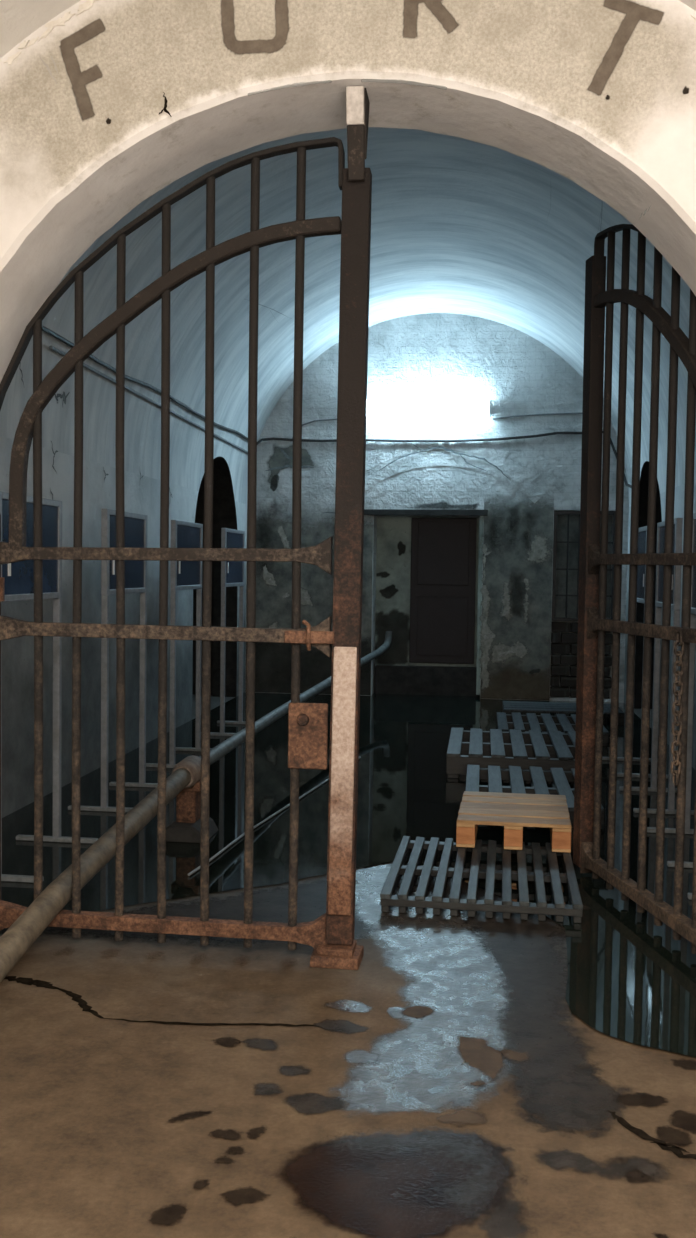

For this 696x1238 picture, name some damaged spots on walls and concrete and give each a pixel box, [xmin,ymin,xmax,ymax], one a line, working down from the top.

crack [159,92,172,117]
spalling [266,445,314,491]
water stain [480,499,554,700]
crack [4,975,321,1028]
crack [607,1110,696,1159]
water stain [537,1150,668,1183]
water stain [479,1178,530,1238]